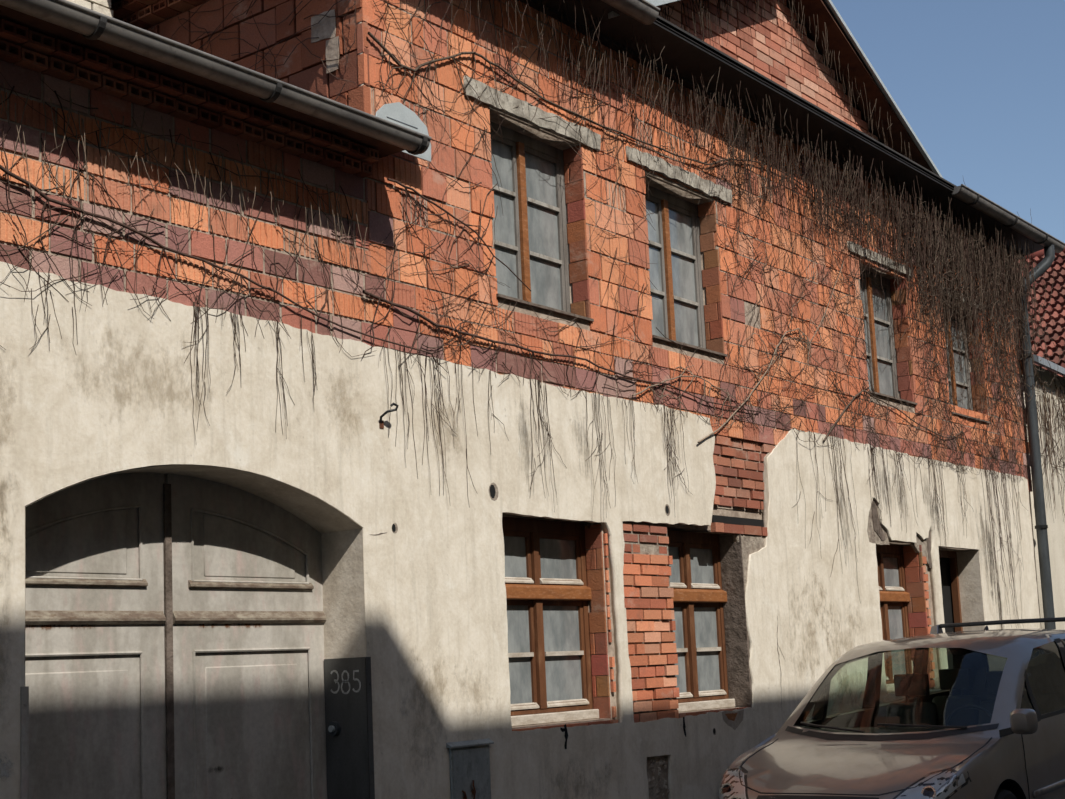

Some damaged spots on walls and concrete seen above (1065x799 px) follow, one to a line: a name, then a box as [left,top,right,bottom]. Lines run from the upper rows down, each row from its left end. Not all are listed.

flaking render [711,428,776,591]
flaking render [867,500,890,545]
flaking render [910,530,932,569]
flaking render [623,504,680,723]
flaking render [713,630,752,735]